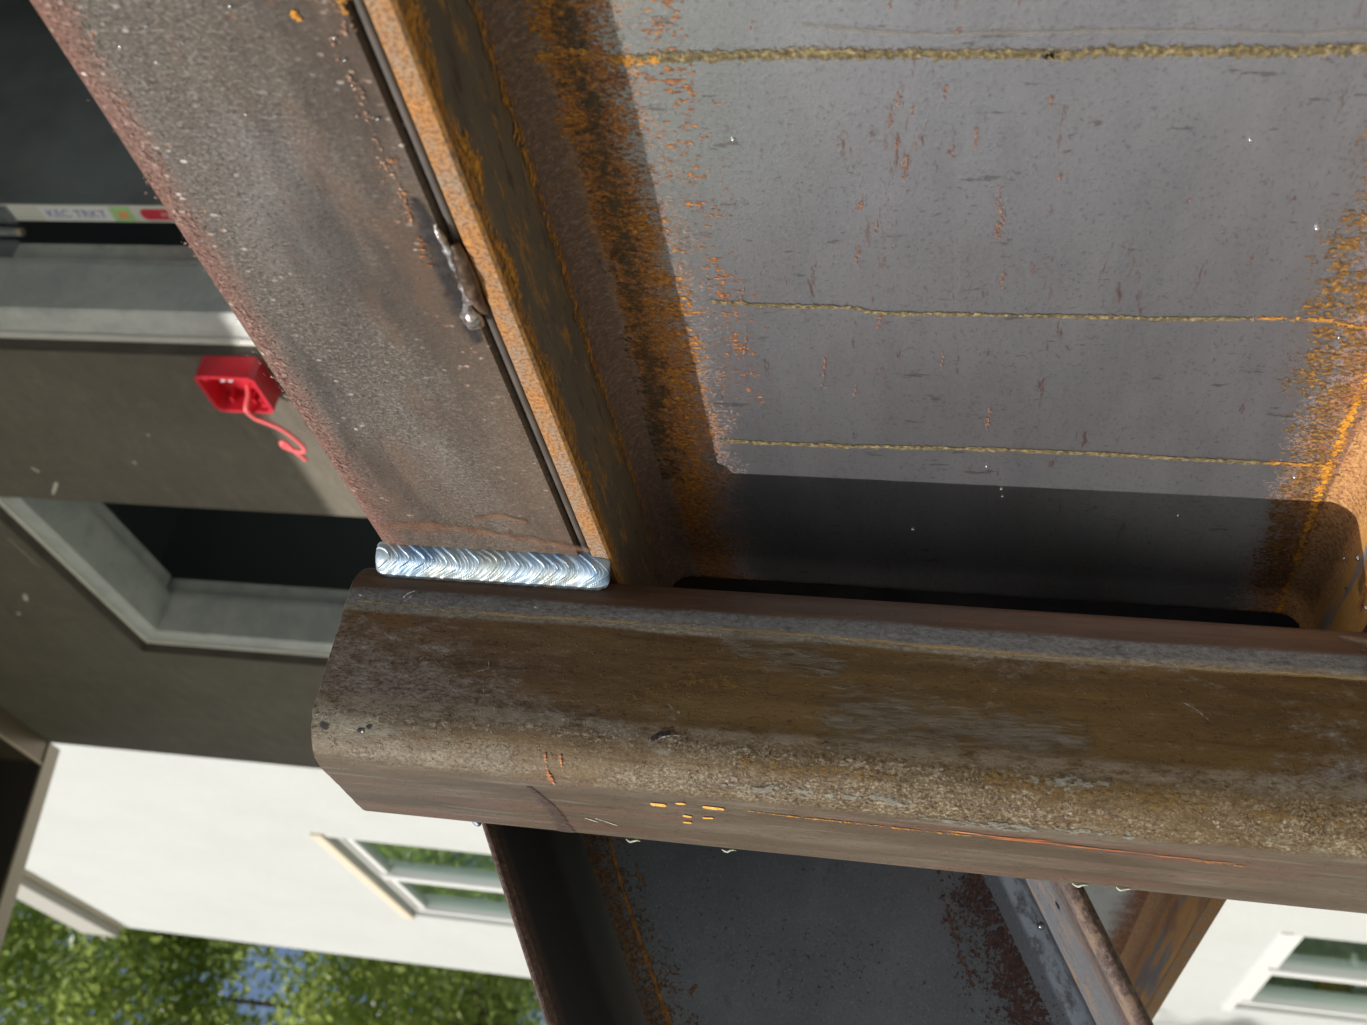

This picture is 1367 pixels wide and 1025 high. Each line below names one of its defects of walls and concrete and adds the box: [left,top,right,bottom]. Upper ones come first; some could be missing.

corrosion [31,0,365,506]
corrosion [315,0,433,267]
corrosion [380,0,644,552]
corrosion [524,0,779,530]
corrosion [1245,130,1367,614]
corrosion [1186,667,1367,680]
corrosion [580,833,701,1025]
corrosion [650,803,724,824]
corrosion [929,870,1054,1025]